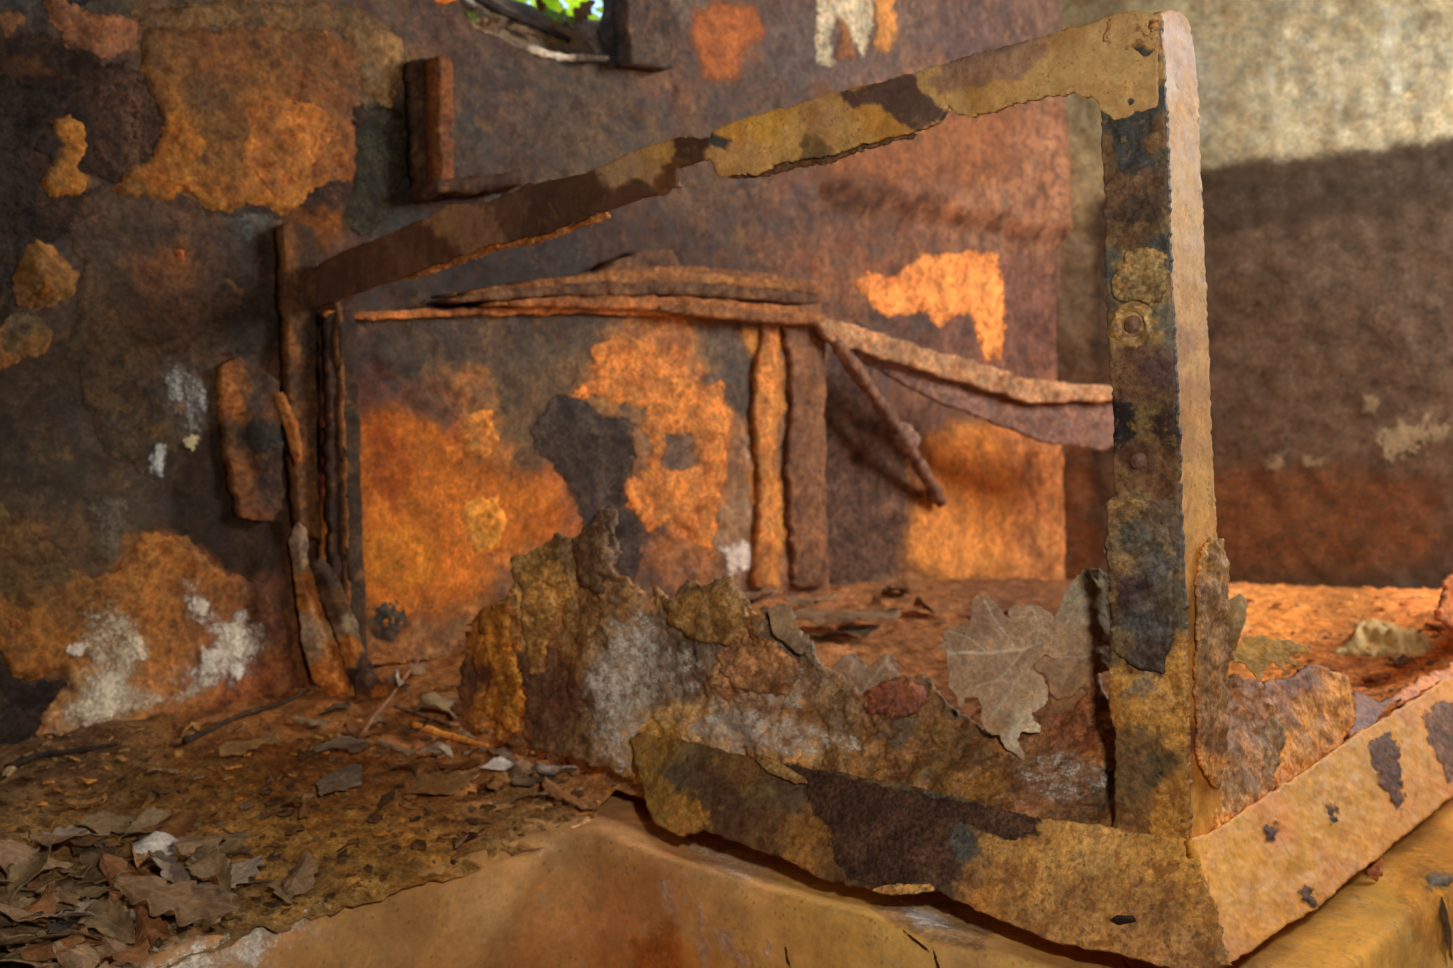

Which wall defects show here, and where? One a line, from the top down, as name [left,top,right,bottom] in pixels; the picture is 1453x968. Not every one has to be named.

rust [0,0,405,474]
rust [360,404,564,629]
leakage [51,584,265,732]
crack [904,931,940,968]